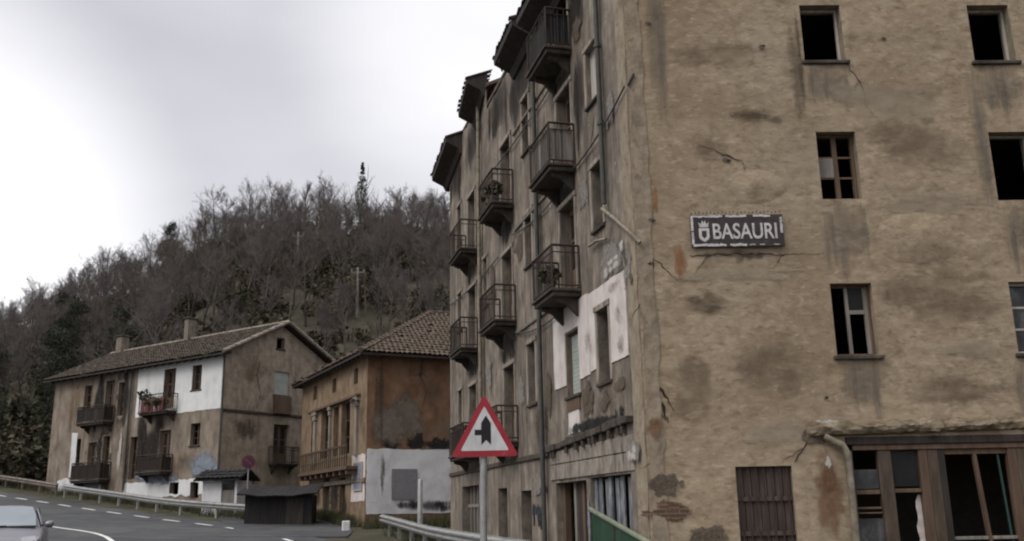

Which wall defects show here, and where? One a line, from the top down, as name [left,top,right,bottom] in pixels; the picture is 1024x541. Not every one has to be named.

peeling [600,238,632,290]
rust [675,250,686,274]
crack [638,252,823,279]
crack [660,387,674,421]
spalling [641,473,692,522]
spalling [690,525,728,541]